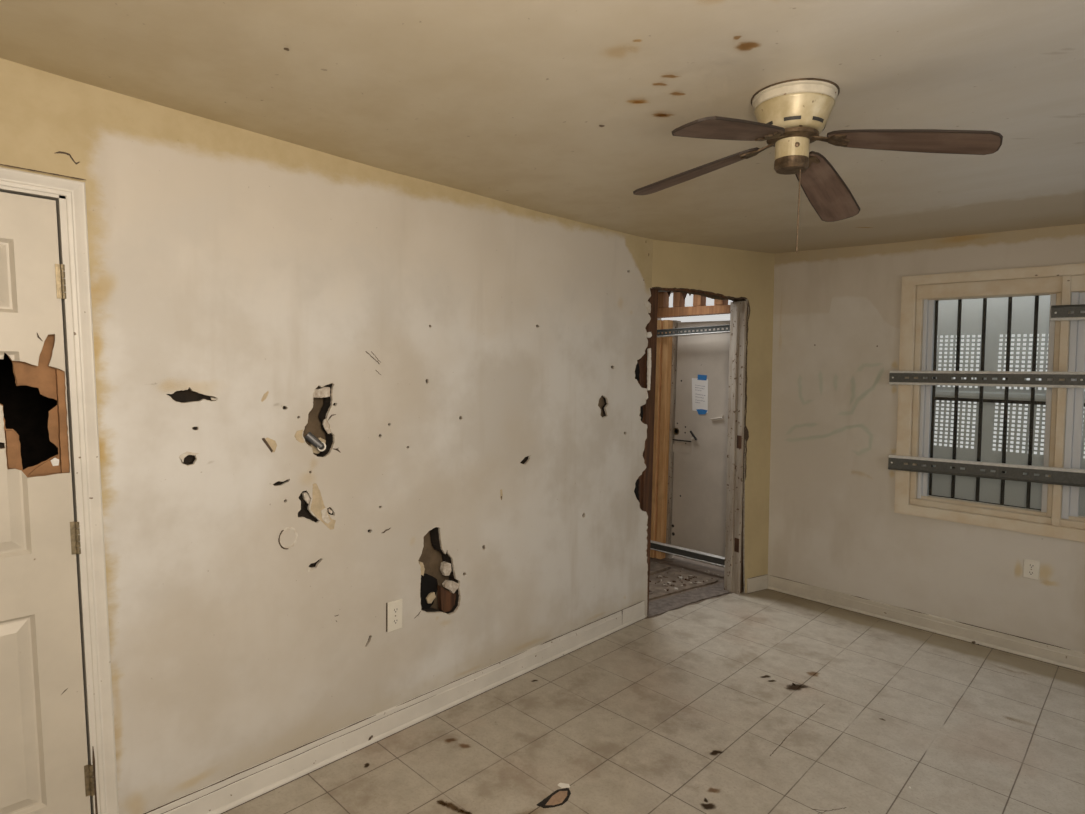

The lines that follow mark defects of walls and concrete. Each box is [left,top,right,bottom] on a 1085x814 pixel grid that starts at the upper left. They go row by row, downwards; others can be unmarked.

spalling [282,383,337,458]
spalling [633,287,750,617]
spalling [284,471,336,530]
spalling [418,526,466,615]